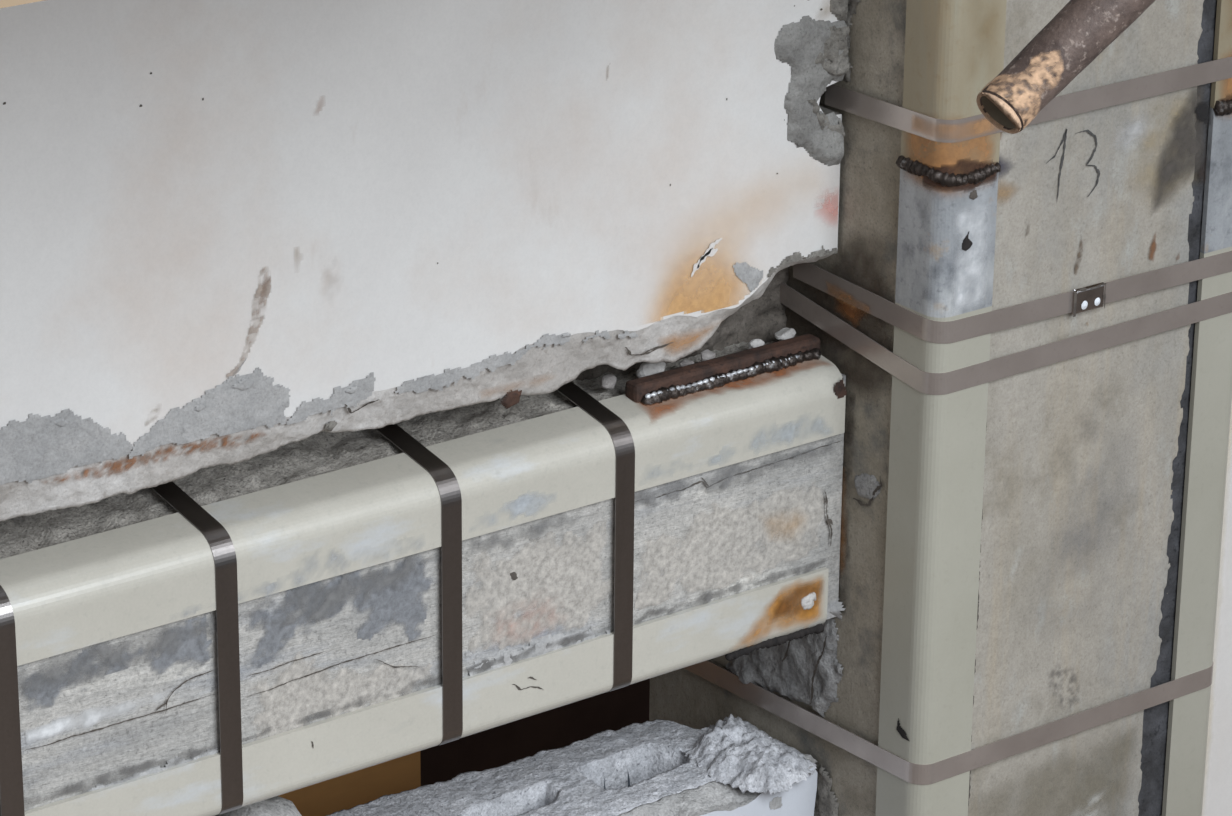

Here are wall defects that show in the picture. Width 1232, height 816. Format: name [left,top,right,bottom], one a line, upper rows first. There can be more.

rust [910,119,997,190]
rust [691,238,722,277]
rust [672,290,726,314]
flaking render [0,245,837,521]
rust [694,366,801,396]
rust [644,402,676,417]
rust [752,581,820,637]
crack [247,635,434,697]
crack [23,670,214,752]
spalling [215,796,302,816]
flaking render [617,780,754,816]
flaking render [770,796,782,810]